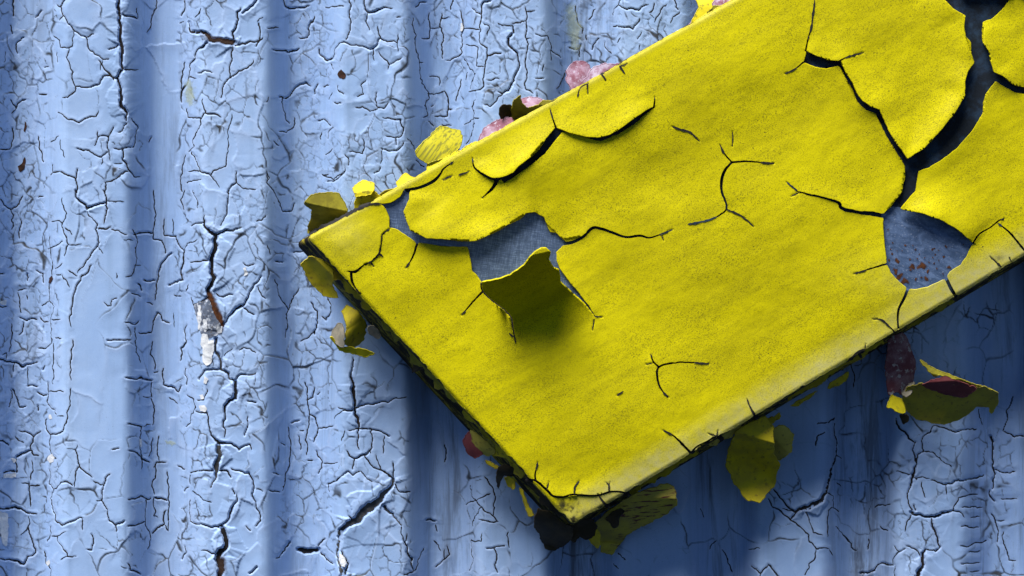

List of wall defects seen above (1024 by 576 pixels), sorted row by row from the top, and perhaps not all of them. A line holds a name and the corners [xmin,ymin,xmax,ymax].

crack [563,0,1024,245]
corrosion [207,293,224,326]
crack [0,0,680,576]
peeling [304,173,595,316]
crack [854,264,885,274]
crack [875,290,909,333]
corrosion [888,242,951,284]
peeling [881,206,973,291]
crack [946,279,957,298]
crack [972,218,1024,267]
peeling [194,300,222,412]
crack [768,396,1024,576]